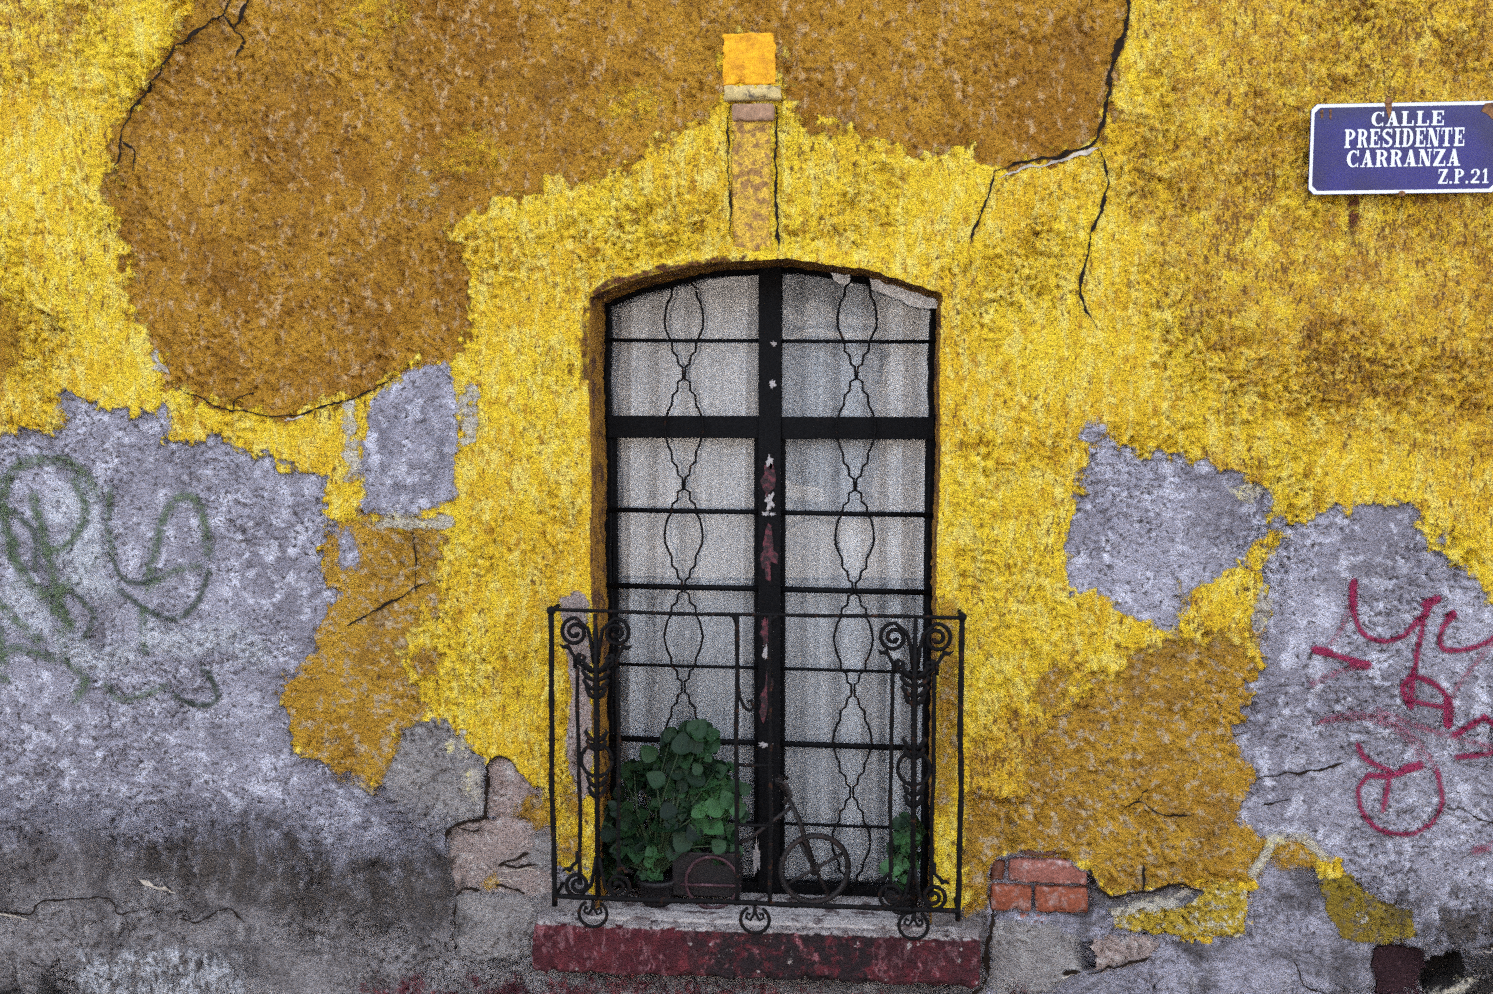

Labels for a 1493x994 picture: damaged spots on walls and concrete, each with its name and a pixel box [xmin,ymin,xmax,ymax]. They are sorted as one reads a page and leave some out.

crack [970,0,1131,328]
peeling [0,0,1129,897]
flaking render [935,422,1493,955]
damp [78,947,245,994]
damp [0,817,464,936]
damp [1371,886,1493,994]